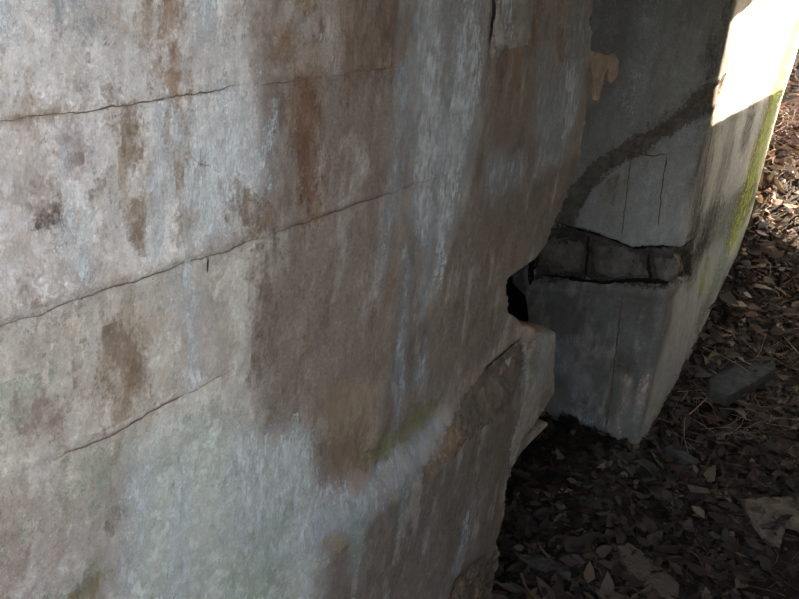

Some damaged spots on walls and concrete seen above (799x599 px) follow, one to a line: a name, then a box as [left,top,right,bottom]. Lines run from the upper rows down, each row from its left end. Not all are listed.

crack [0,85,234,122]
leakage [0,106,105,326]
leakage [146,65,279,393]
crack [0,166,473,327]
leakage [319,0,593,438]
crack [528,258,536,286]
leakage [114,395,445,599]
spalling [419,331,556,482]